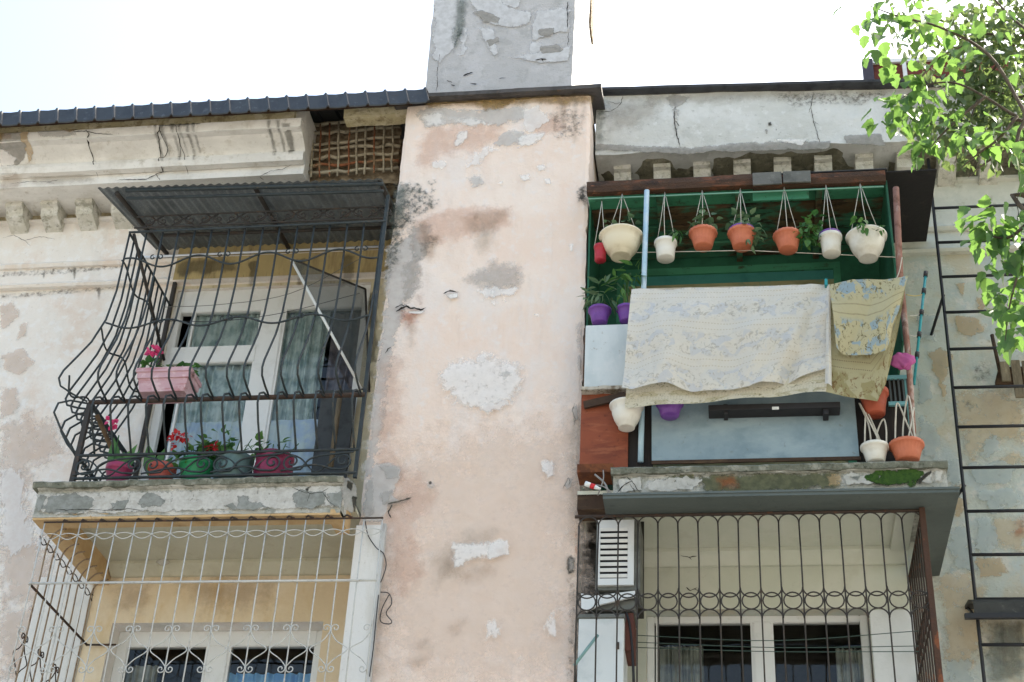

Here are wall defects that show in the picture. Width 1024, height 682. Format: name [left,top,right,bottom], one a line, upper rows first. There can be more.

peeling [431,0,571,63]
peeling [417,106,548,133]
damp [385,184,437,279]
spalling [477,286,517,304]
peeling [0,226,430,556]
peeling [618,476,702,492]
peeling [843,471,881,485]
peeling [917,375,1024,682]